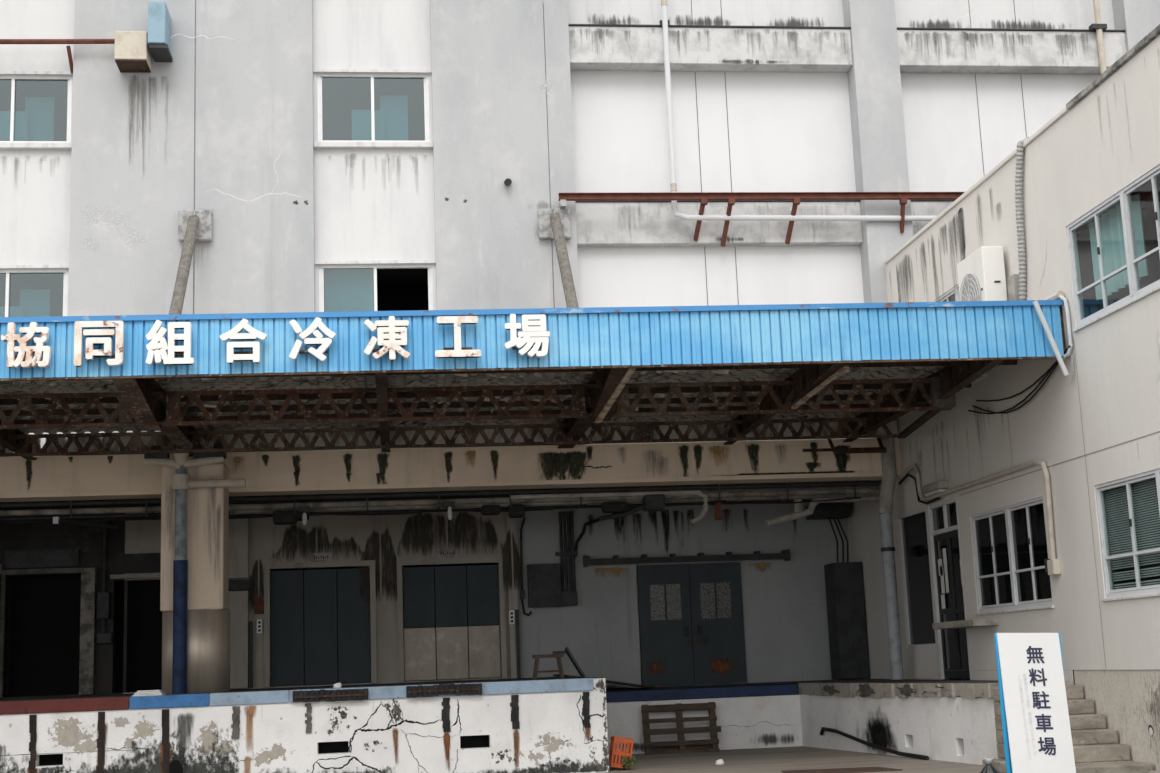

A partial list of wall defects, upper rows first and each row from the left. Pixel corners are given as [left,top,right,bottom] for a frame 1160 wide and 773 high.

leakage [586,17,630,37]
leakage [672,16,730,39]
leakage [775,18,827,45]
leakage [131,76,156,121]
corrosion [316,372,593,428]
peeling [48,717,97,754]
peeling [111,715,157,749]
corrosion [244,706,256,773]
crack [311,700,462,773]